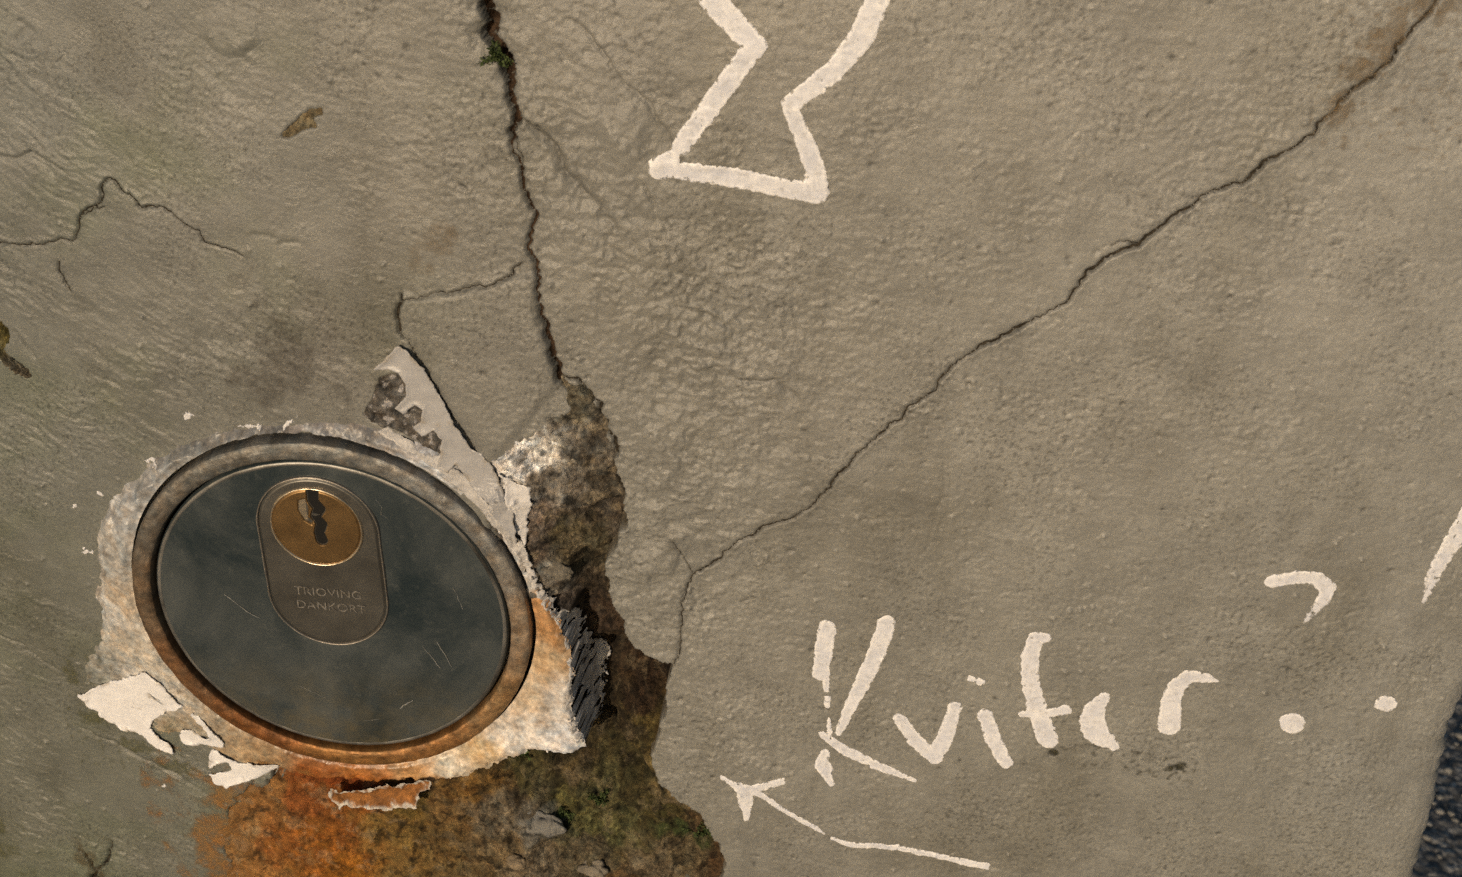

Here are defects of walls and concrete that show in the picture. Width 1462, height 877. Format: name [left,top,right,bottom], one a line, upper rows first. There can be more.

spalling [0,321,32,379]
crack [0,177,243,291]
crack [397,0,619,452]
crack [673,0,1437,664]
corrosion [193,773,258,877]
spalling [77,346,724,877]